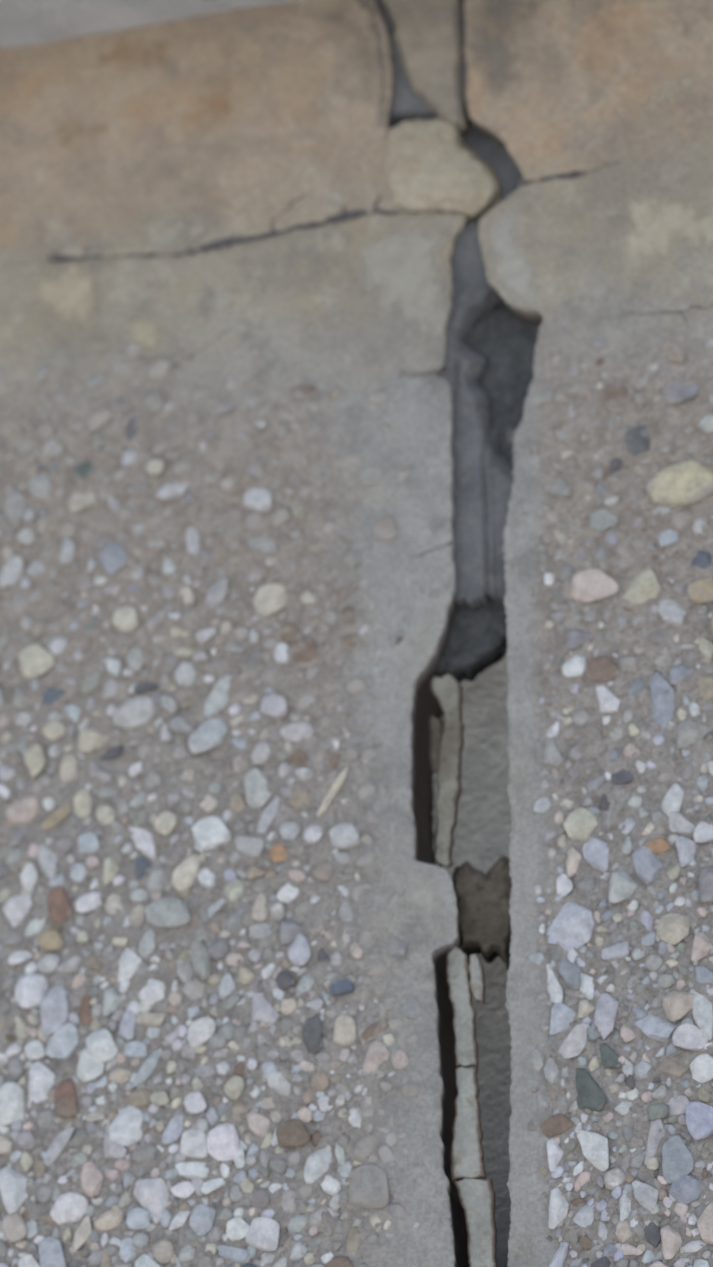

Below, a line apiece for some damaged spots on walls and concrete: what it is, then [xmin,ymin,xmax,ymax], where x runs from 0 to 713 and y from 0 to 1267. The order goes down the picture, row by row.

crack [48,196,456,261]